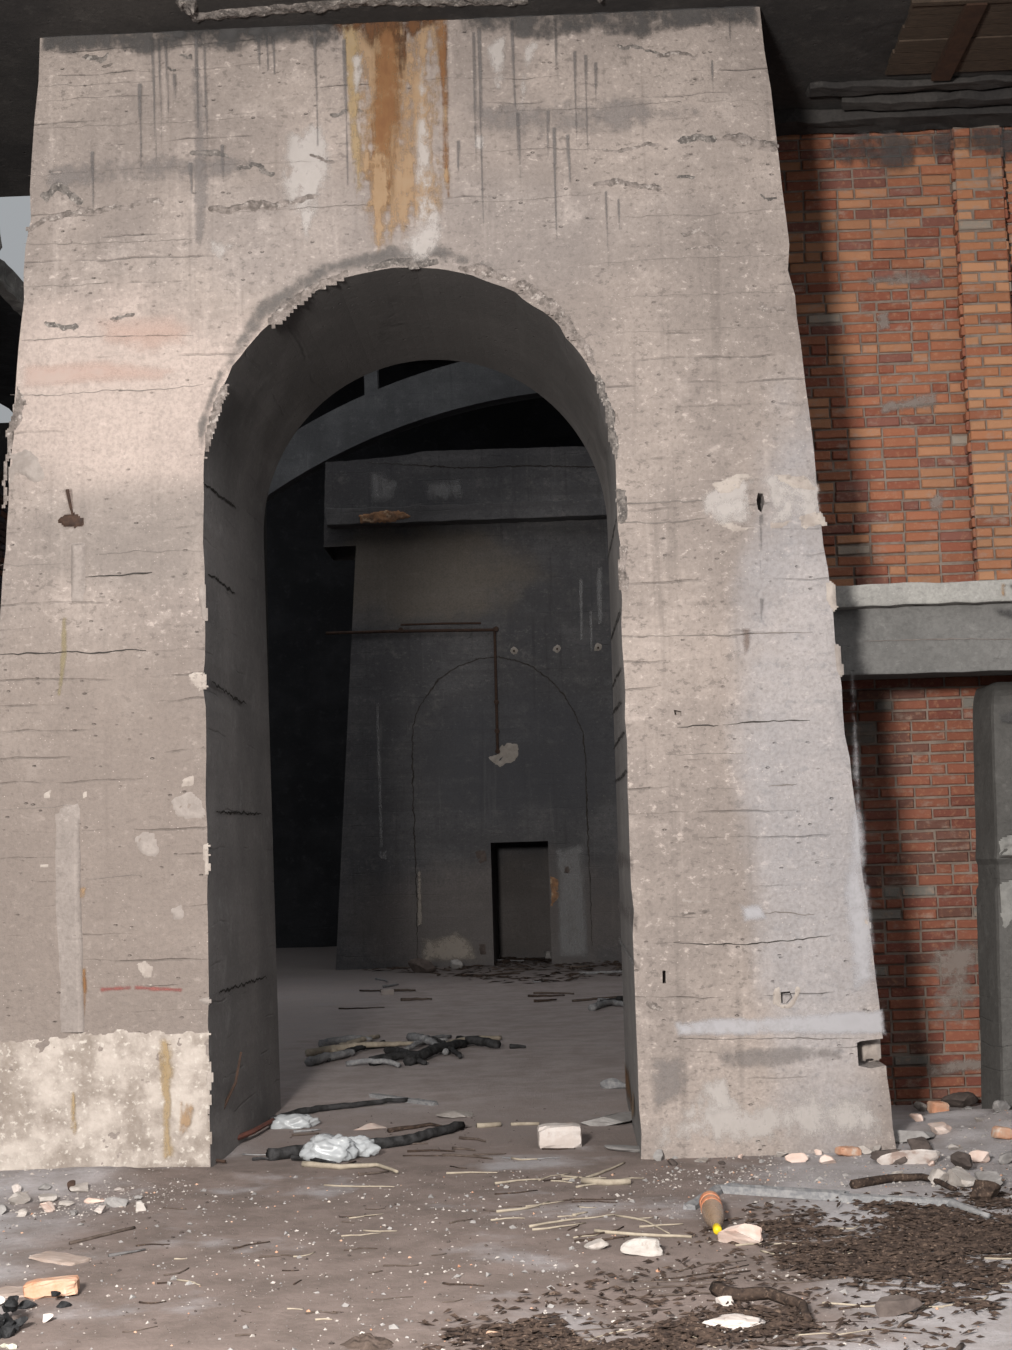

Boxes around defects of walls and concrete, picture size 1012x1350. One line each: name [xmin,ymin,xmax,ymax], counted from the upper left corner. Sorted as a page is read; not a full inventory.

corrosion [334,20,449,245]
spalling [268,270,348,328]
spalling [365,257,619,459]
spalling [204,384,229,459]
spalling [615,488,628,524]
spalling [705,474,827,532]
spalling [618,545,629,592]
peeling [489,743,518,767]
peeling [1000,880,1012,928]